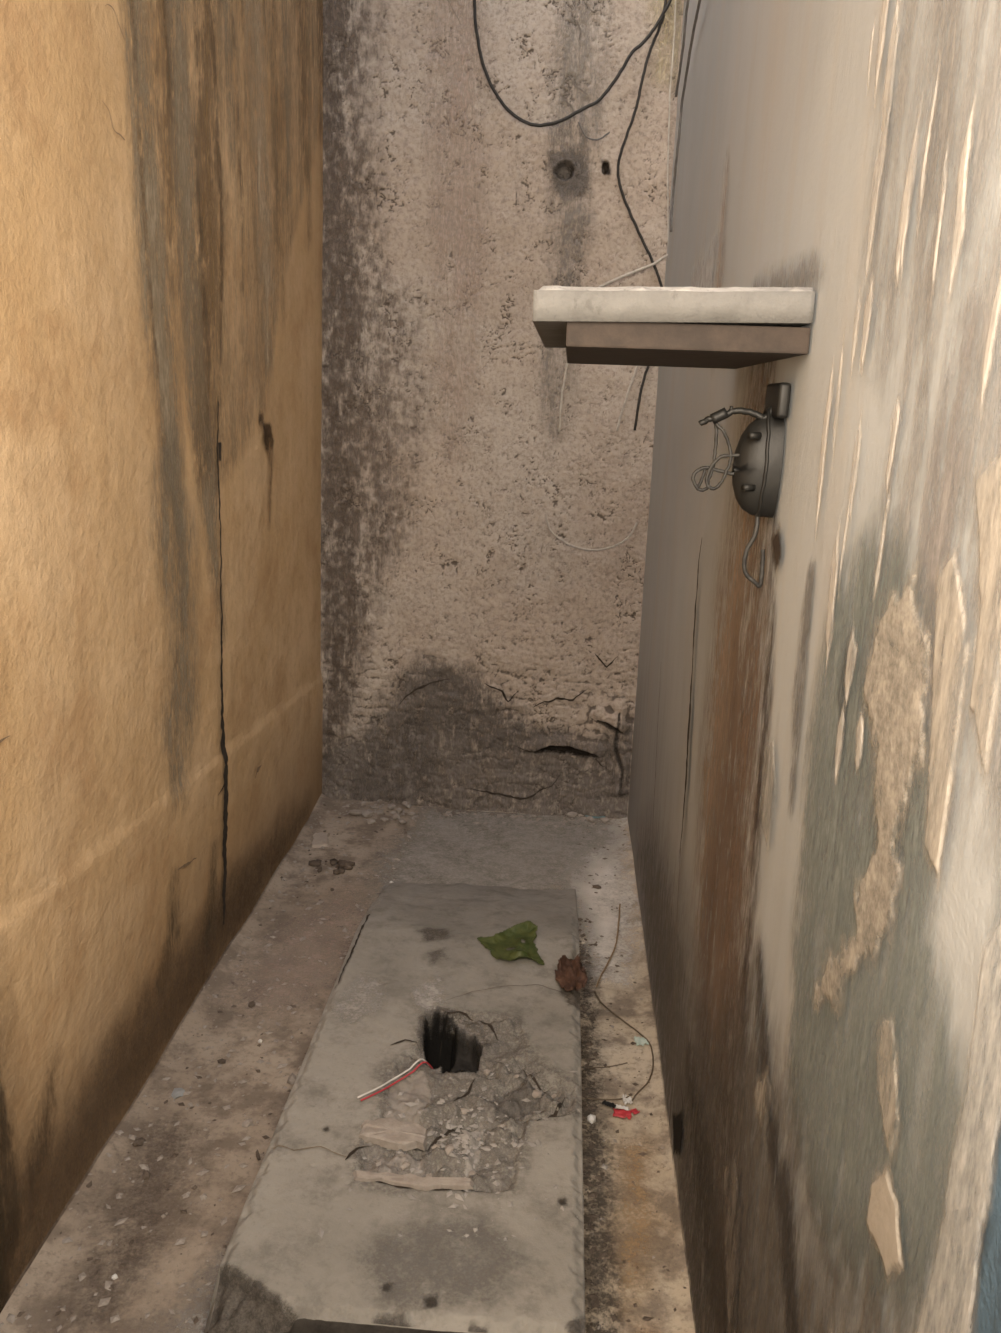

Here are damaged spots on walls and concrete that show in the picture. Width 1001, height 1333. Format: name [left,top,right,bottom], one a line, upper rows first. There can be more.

peeling [815,0,900,535]
peeling [895,85,937,282]
peeling [932,107,973,291]
crack [217,401,229,925]
leakage [125,0,645,985]
peeling [814,438,1001,1008]
leakage [0,828,296,1319]
spalling [207,1265,296,1333]
leakage [413,977,446,1011]
spalling [345,1011,581,1193]
peeling [867,1168,904,1278]
peeling [917,924,1001,1333]